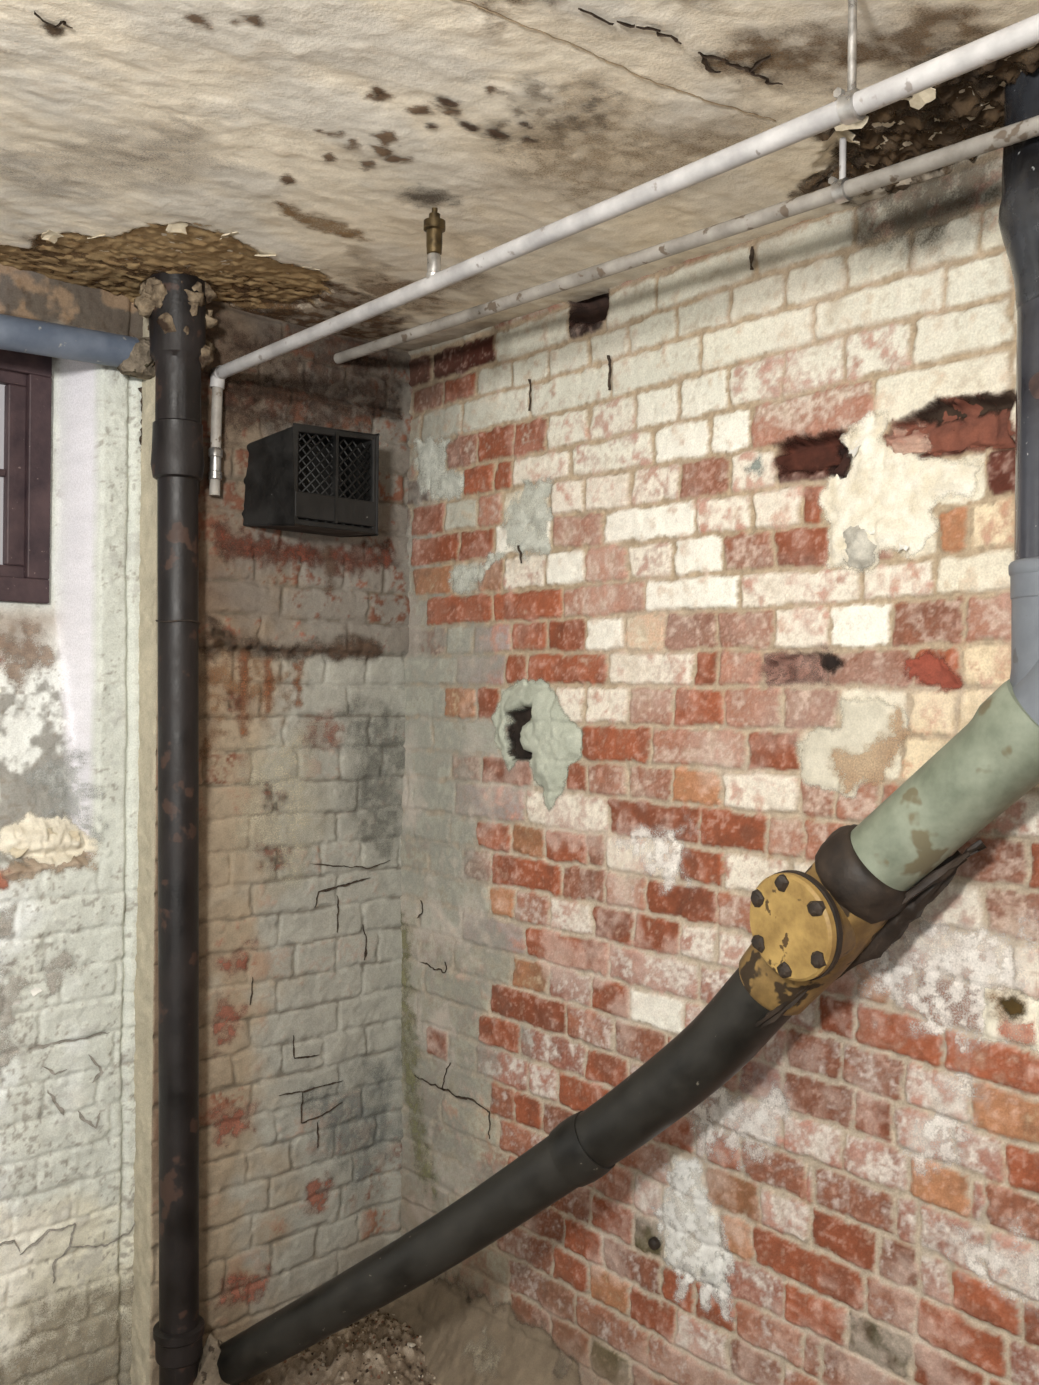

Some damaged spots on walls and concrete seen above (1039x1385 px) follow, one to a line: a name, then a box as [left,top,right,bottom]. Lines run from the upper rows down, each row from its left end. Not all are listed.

crack [457,0,783,121]
water stain [315,130,411,168]
water stain [407,83,741,195]
flaking render [789,43,1039,198]
flaking render [0,222,333,320]
spalling [774,430,861,479]
spalling [883,389,1016,458]
crack [310,860,390,960]
crack [279,1035,342,1148]
water stain [689,1087,788,1161]
crack [0,1223,135,1283]
water stain [675,1265,732,1320]